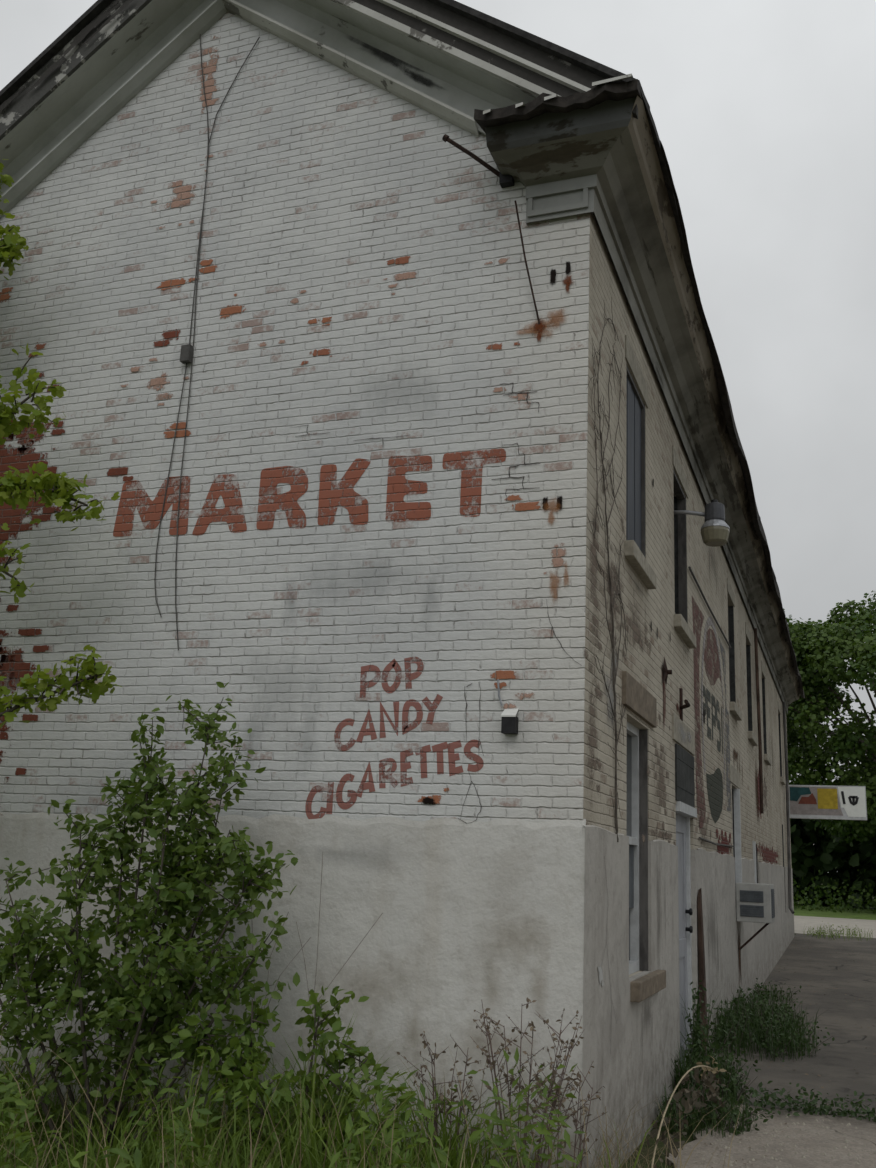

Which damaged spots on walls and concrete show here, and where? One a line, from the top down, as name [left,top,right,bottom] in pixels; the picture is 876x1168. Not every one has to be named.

peeling [0,0,133,112]
peeling [200,36,221,113]
peeling [150,180,196,208]
peeling [157,259,218,291]
peeling [220,294,246,319]
corrosion [518,310,563,342]
peeling [301,348,332,365]
peeling [0,420,65,479]
peeling [0,490,65,564]
peeling [0,628,49,704]
peeling [0,714,38,763]